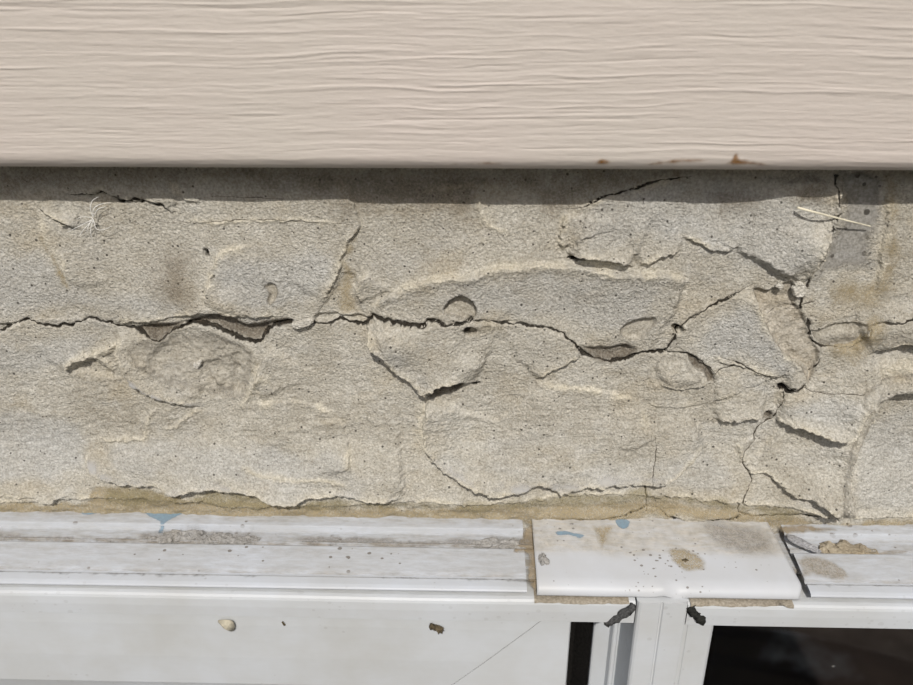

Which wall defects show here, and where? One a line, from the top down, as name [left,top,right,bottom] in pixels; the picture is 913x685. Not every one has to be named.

spalling [130,335,252,398]
flaking render [291,317,314,329]
crack [0,174,913,521]
spalling [620,317,656,340]
spalling [754,281,869,381]